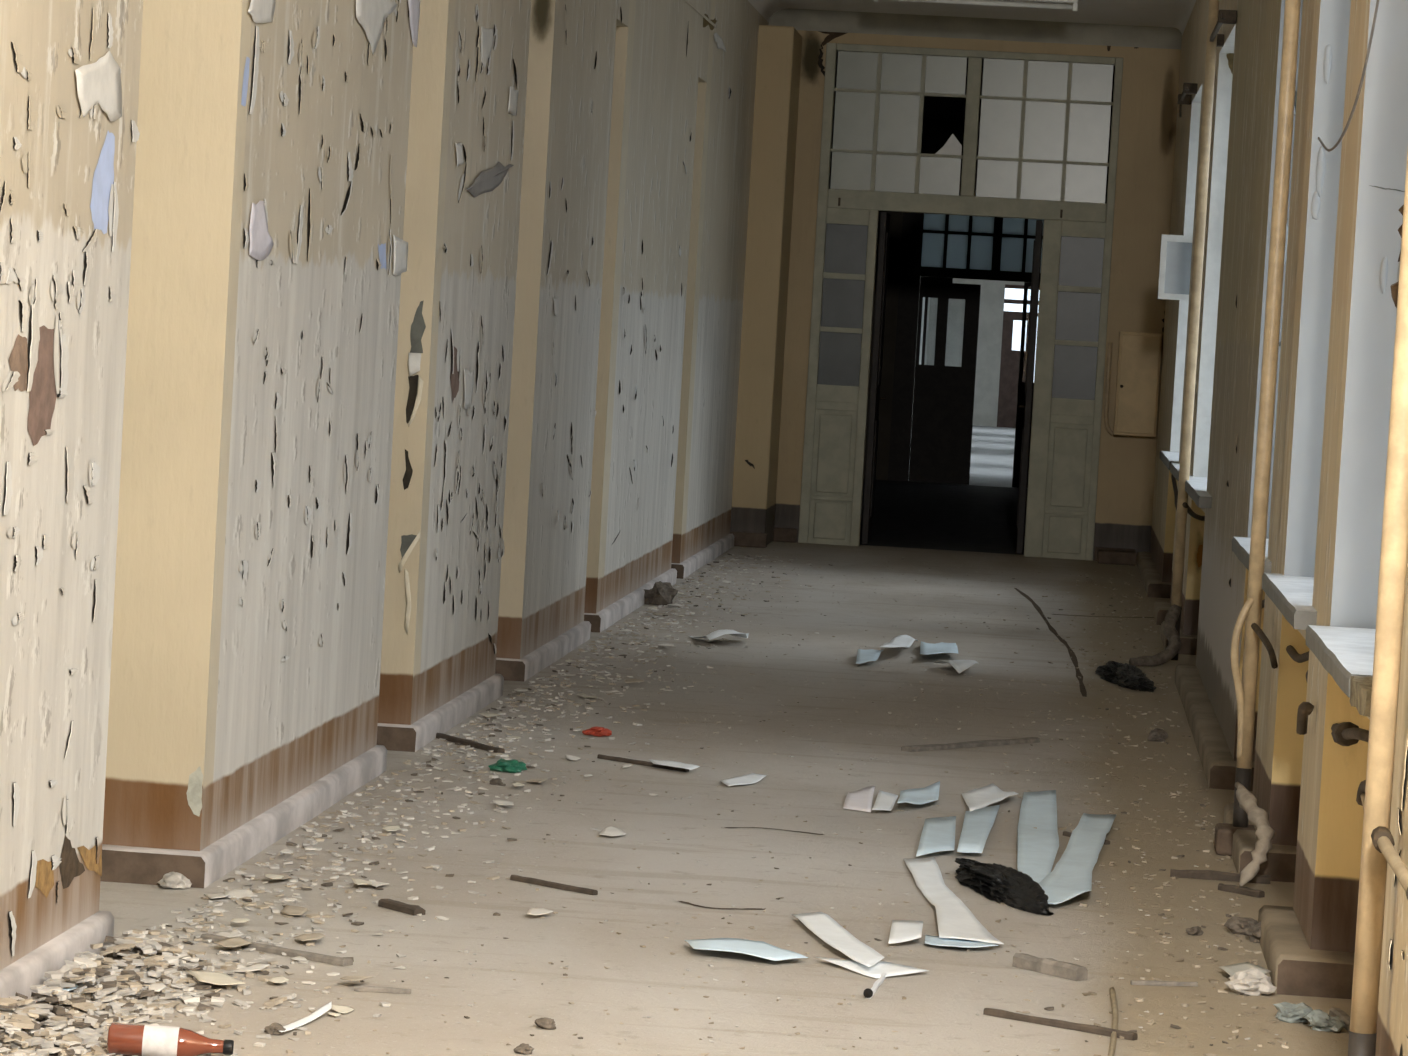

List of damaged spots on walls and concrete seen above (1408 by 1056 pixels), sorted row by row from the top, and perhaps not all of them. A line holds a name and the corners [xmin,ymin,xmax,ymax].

peeling [241,0,276,115]
peeling [280,26,338,114]
peeling [356,0,420,65]
peeling [455,4,518,203]
peeling [243,114,394,268]
peeling [376,154,408,276]
peeling [0,8,140,538]
spalling [1390,281,1399,308]
peeling [13,534,52,572]
peeling [71,532,103,622]
peeling [64,721,75,758]
peeling [12,782,20,826]